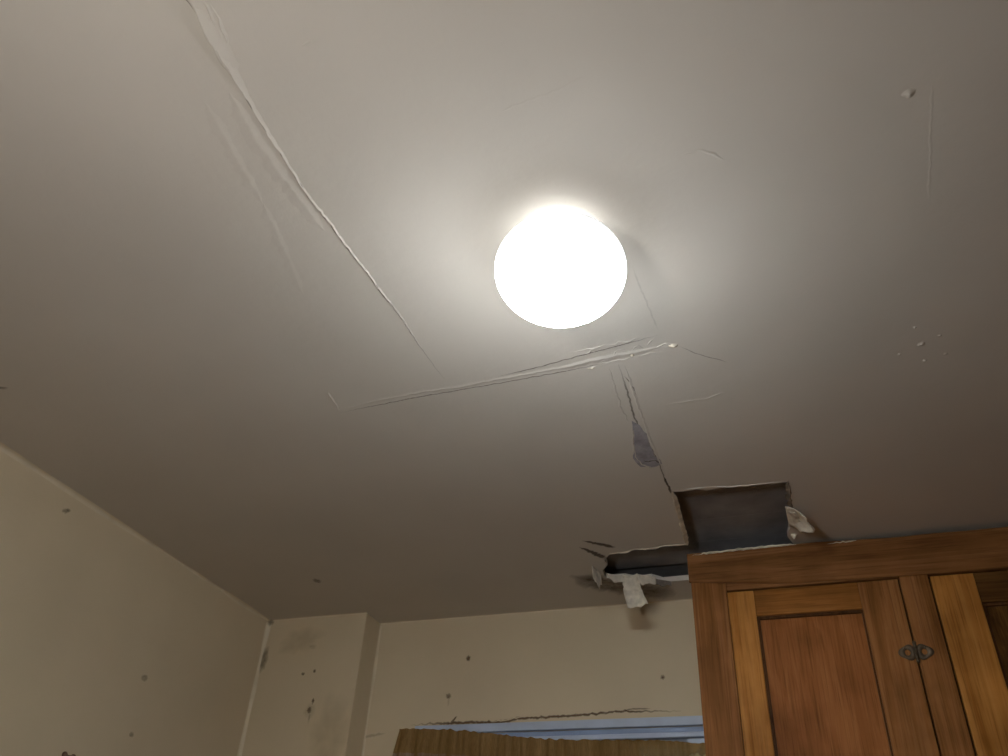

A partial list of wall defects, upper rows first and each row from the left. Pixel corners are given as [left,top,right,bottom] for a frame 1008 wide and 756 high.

crack [188,0,665,476]
spalling [604,482,793,577]